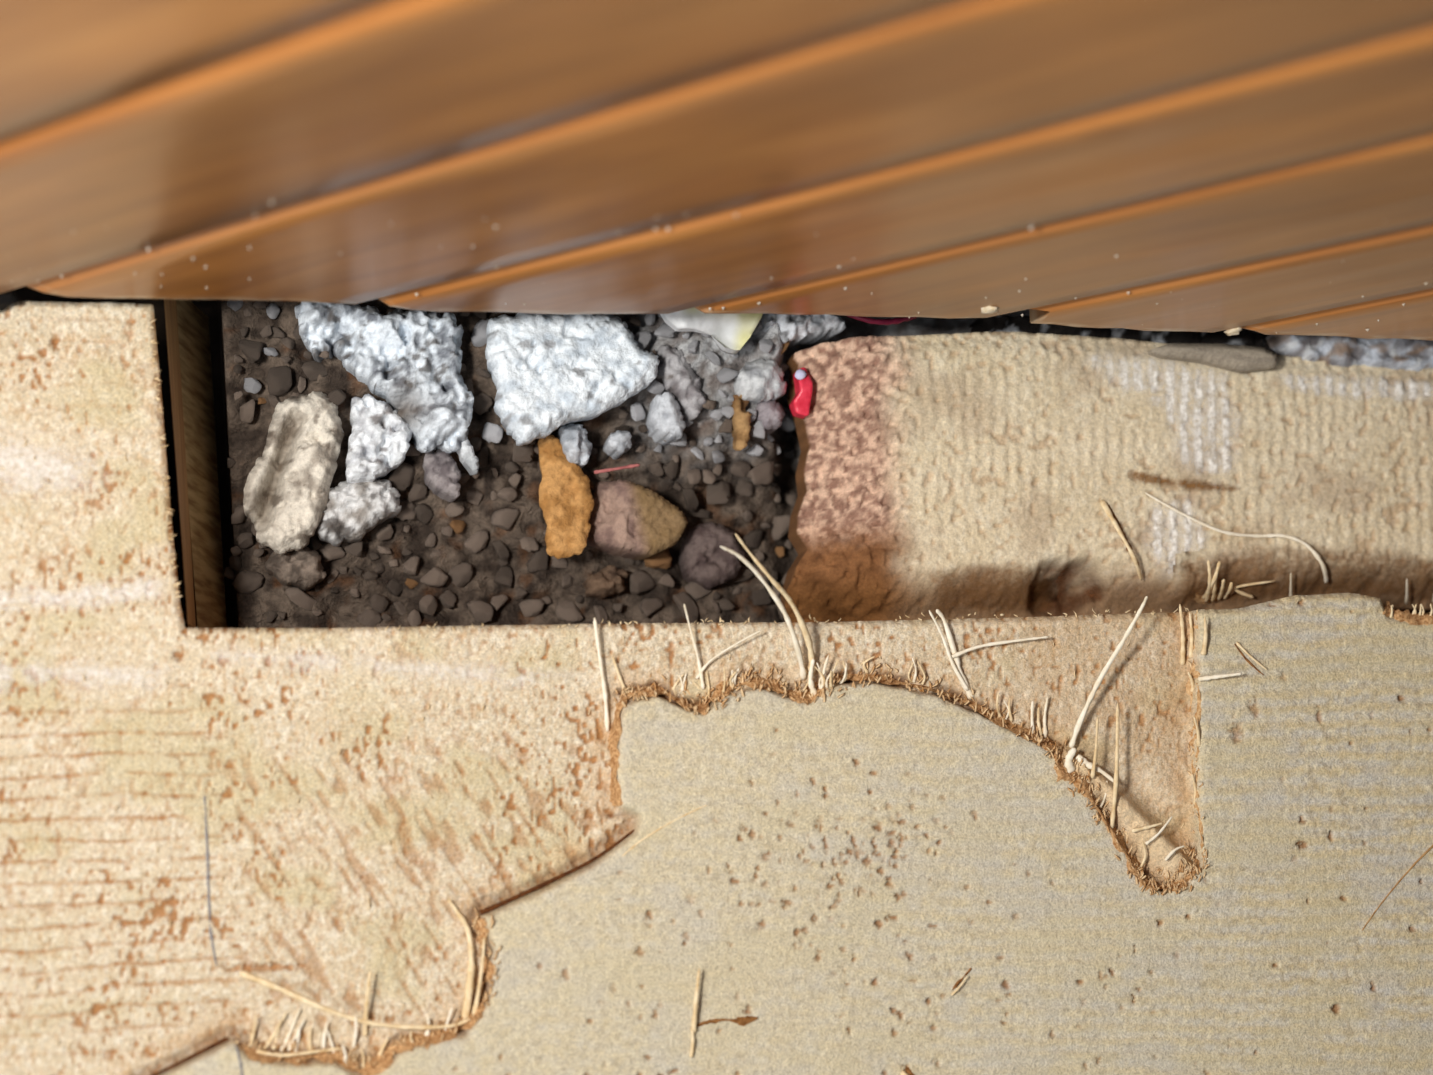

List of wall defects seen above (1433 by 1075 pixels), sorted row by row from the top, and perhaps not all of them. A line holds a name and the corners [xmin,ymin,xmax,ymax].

spalling [1383,601,1433,626]
spalling [951,968,972,996]
spalling [689,968,758,1058]